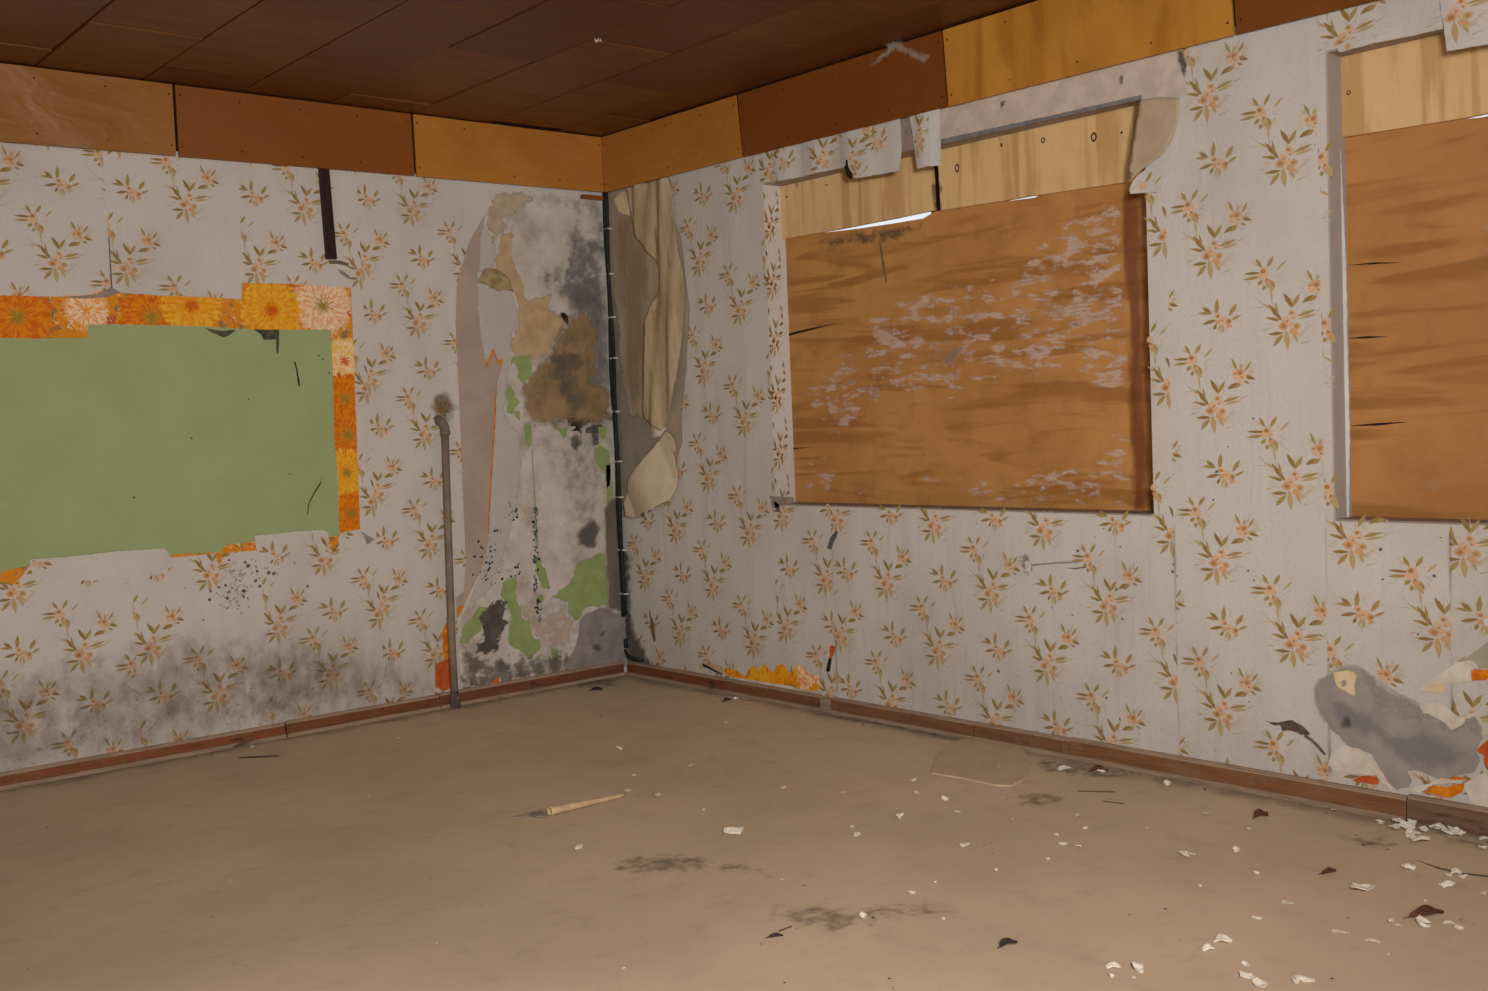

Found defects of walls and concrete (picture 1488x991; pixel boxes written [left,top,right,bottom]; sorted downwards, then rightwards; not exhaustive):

flaking render [455,188,689,689]
damp [205,559,295,614]
spalling [1313,665,1488,807]